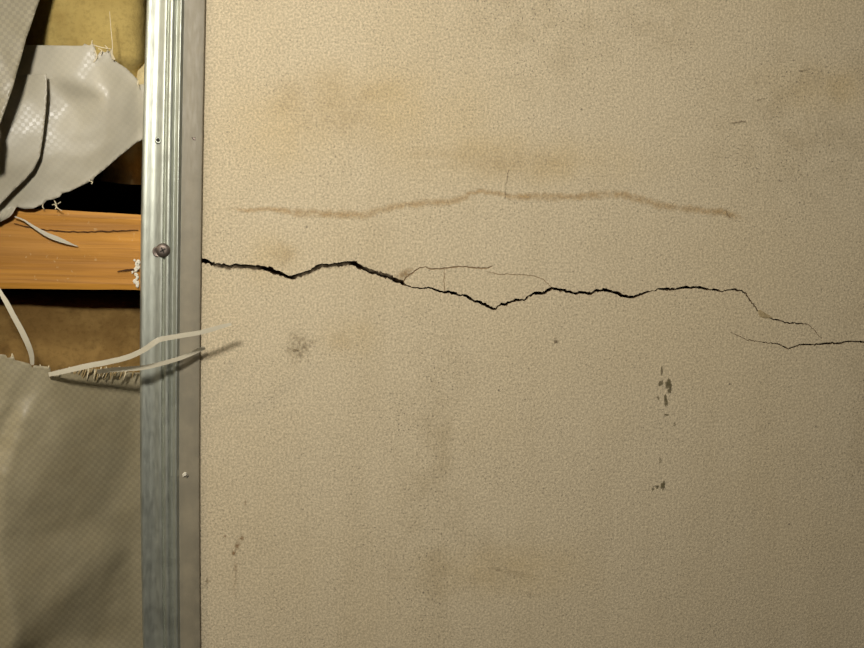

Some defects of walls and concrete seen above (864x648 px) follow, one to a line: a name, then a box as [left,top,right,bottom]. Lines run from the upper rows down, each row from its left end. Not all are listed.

crack [202,258,864,349]